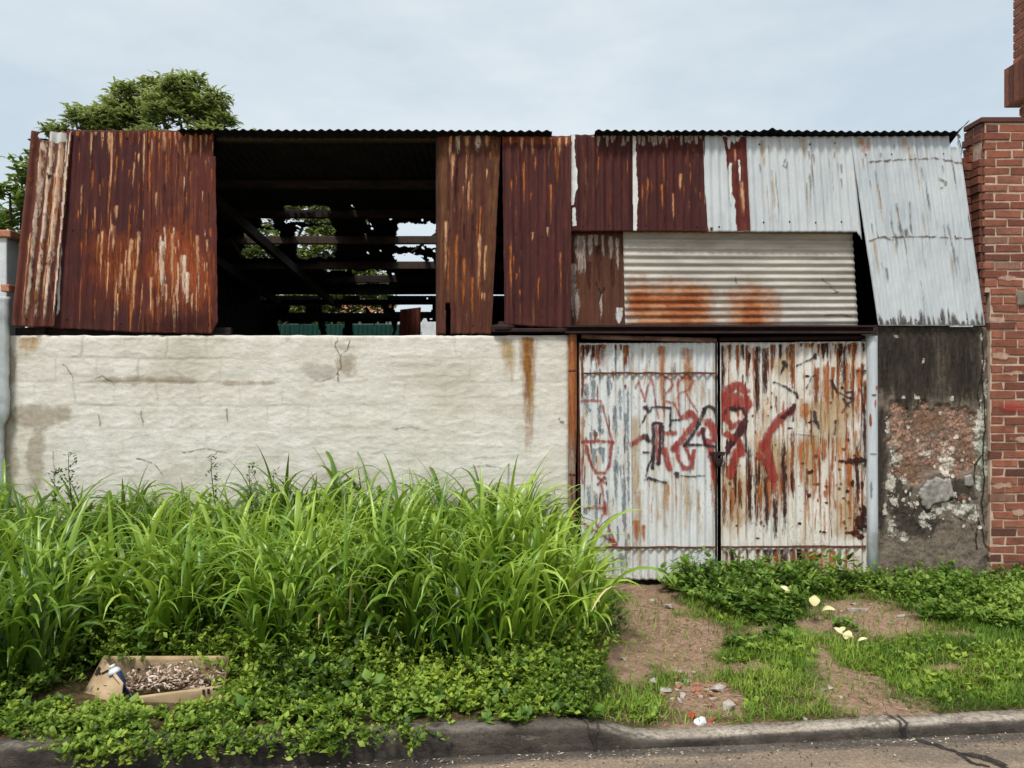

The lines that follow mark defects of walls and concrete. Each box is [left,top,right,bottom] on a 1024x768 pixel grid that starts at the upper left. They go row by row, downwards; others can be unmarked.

corrosion [29,142,62,216]
corrosion [76,131,214,333]
corrosion [440,135,568,320]
corrosion [642,137,705,225]
corrosion [722,136,750,231]
corrosion [628,286,713,325]
corrosion [732,289,778,325]
corrosion [503,337,534,410]
damp [874,309,986,420]
damp [878,409,952,540]
spalling [870,353,1011,545]
damp [947,478,977,503]